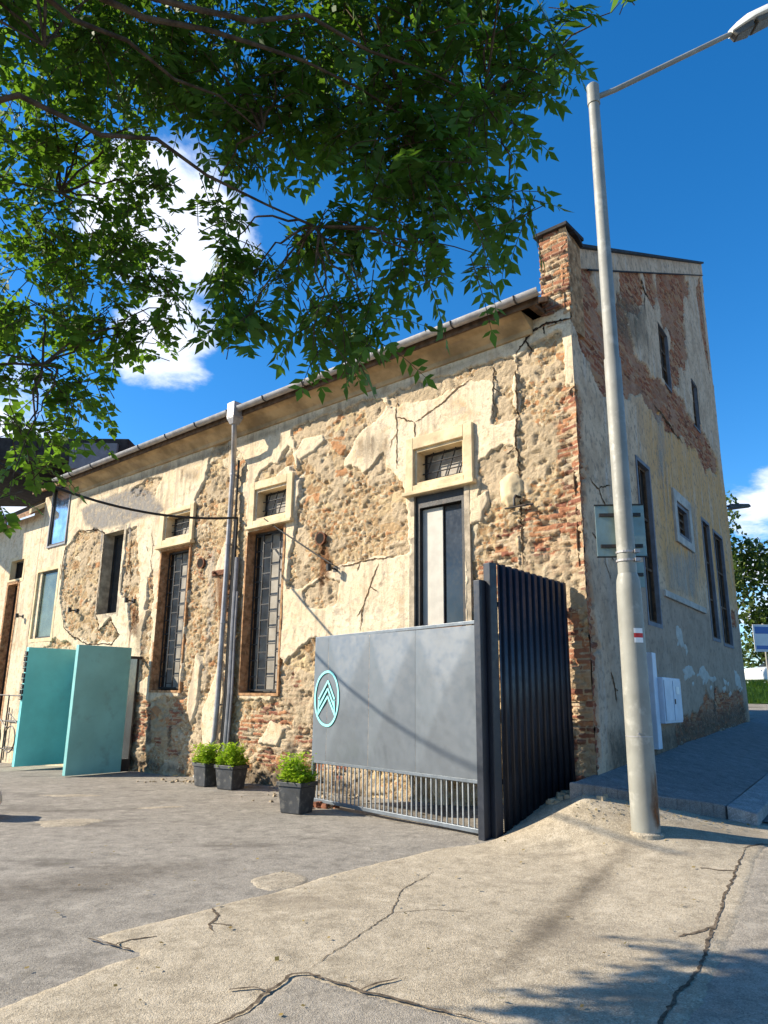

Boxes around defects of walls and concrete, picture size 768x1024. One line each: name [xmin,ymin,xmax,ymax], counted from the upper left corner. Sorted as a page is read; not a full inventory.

spalling [45,528,118,650]
spalling [121,238,606,806]
crack [337,556,390,627]
crack [390,318,571,564]
spalling [615,272,717,474]
spalling [675,626,746,746]